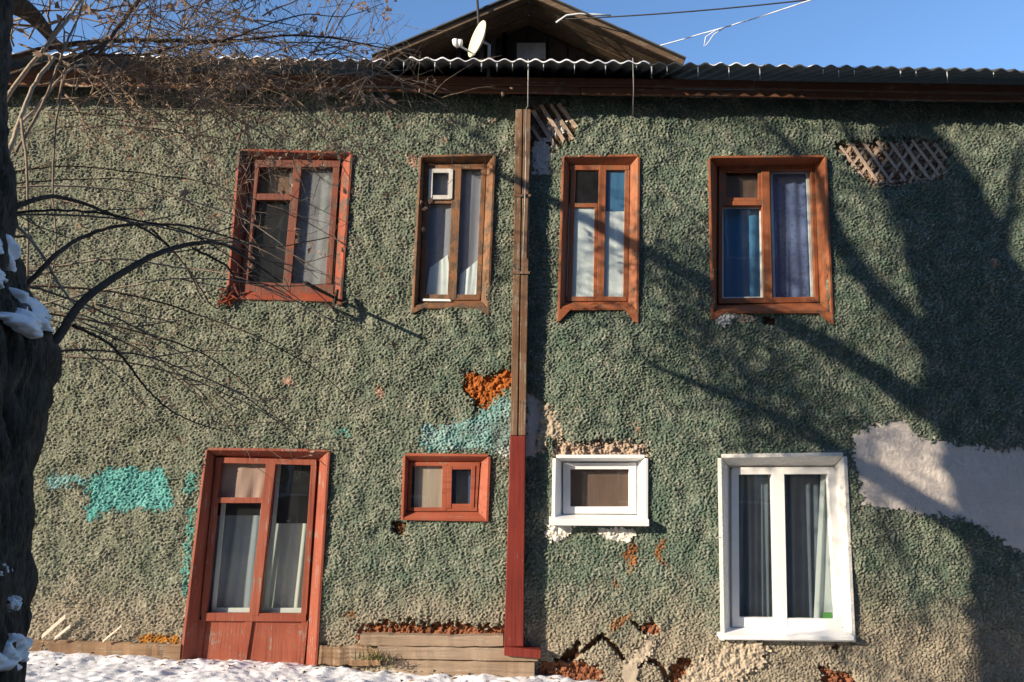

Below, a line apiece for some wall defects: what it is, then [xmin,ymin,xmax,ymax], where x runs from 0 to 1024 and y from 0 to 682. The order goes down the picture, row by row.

peeling [416,367,511,458]
spalling [525,393,653,461]
flaking render [851,419,1024,554]
spalling [342,611,505,641]
spalling [639,616,662,638]
flaking render [538,639,605,682]
crack [575,632,672,682]